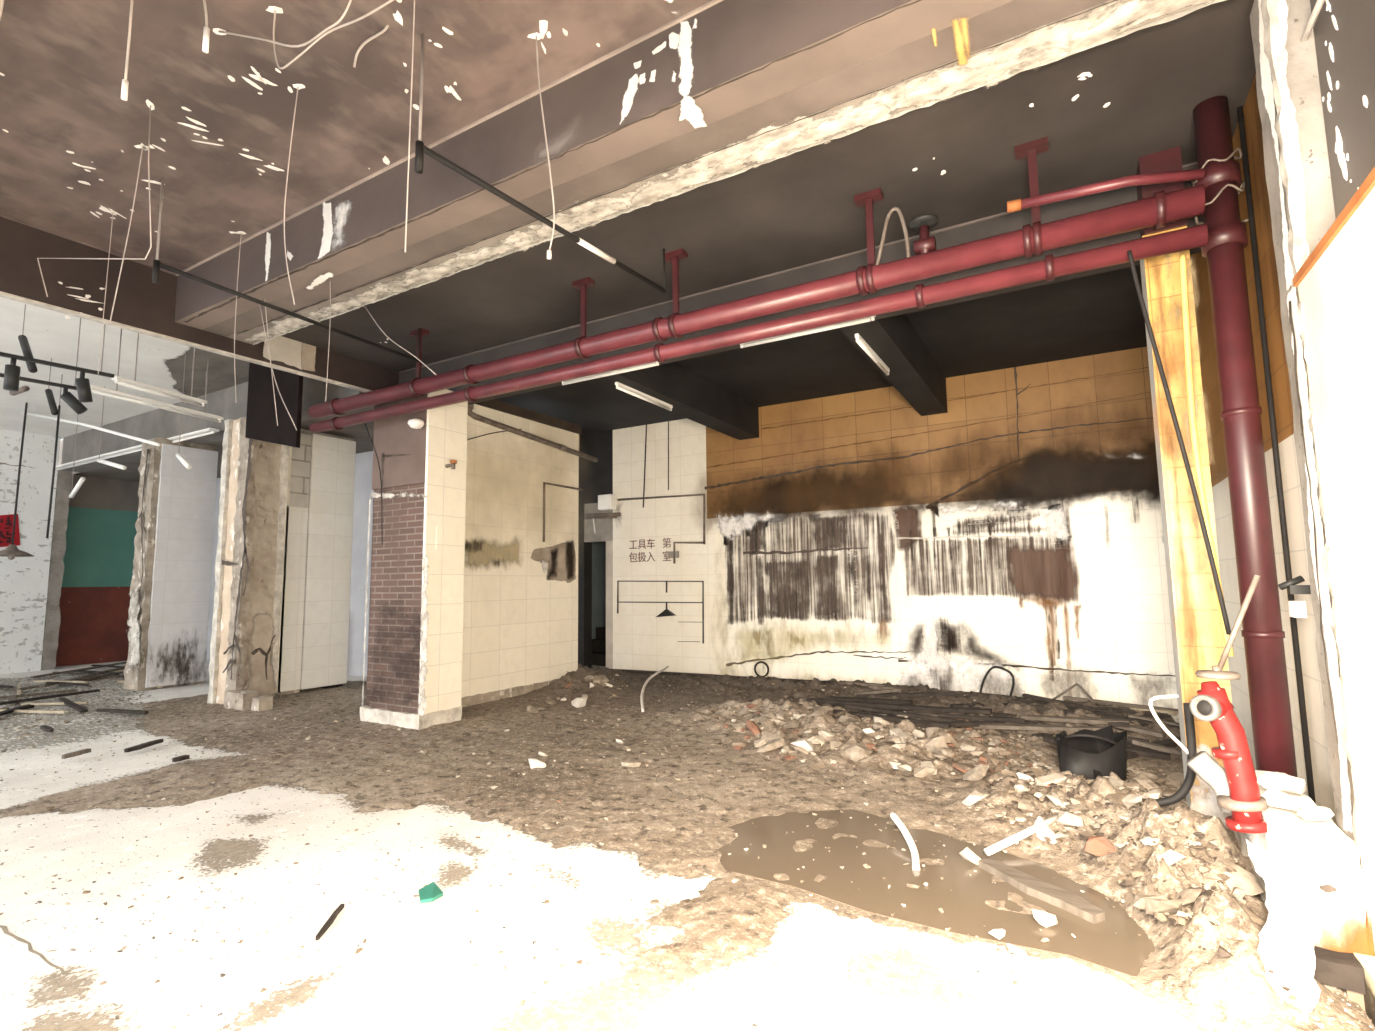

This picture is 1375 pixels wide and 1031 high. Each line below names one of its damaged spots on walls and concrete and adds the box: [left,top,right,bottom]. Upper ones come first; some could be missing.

peeling [66,151,104,189]
spalling [165,0,1226,398]
spalling [1258,0,1364,850]
spalling [126,588,140,674]
mould [151,643,200,686]
spalling [362,492,427,706]
spalling [418,556,428,716]
spalling [531,542,576,583]
peeling [719,514,772,540]
water stain [713,454,1078,648]
rust [1020,596,1081,680]
water stain [1363,981,1375,1027]